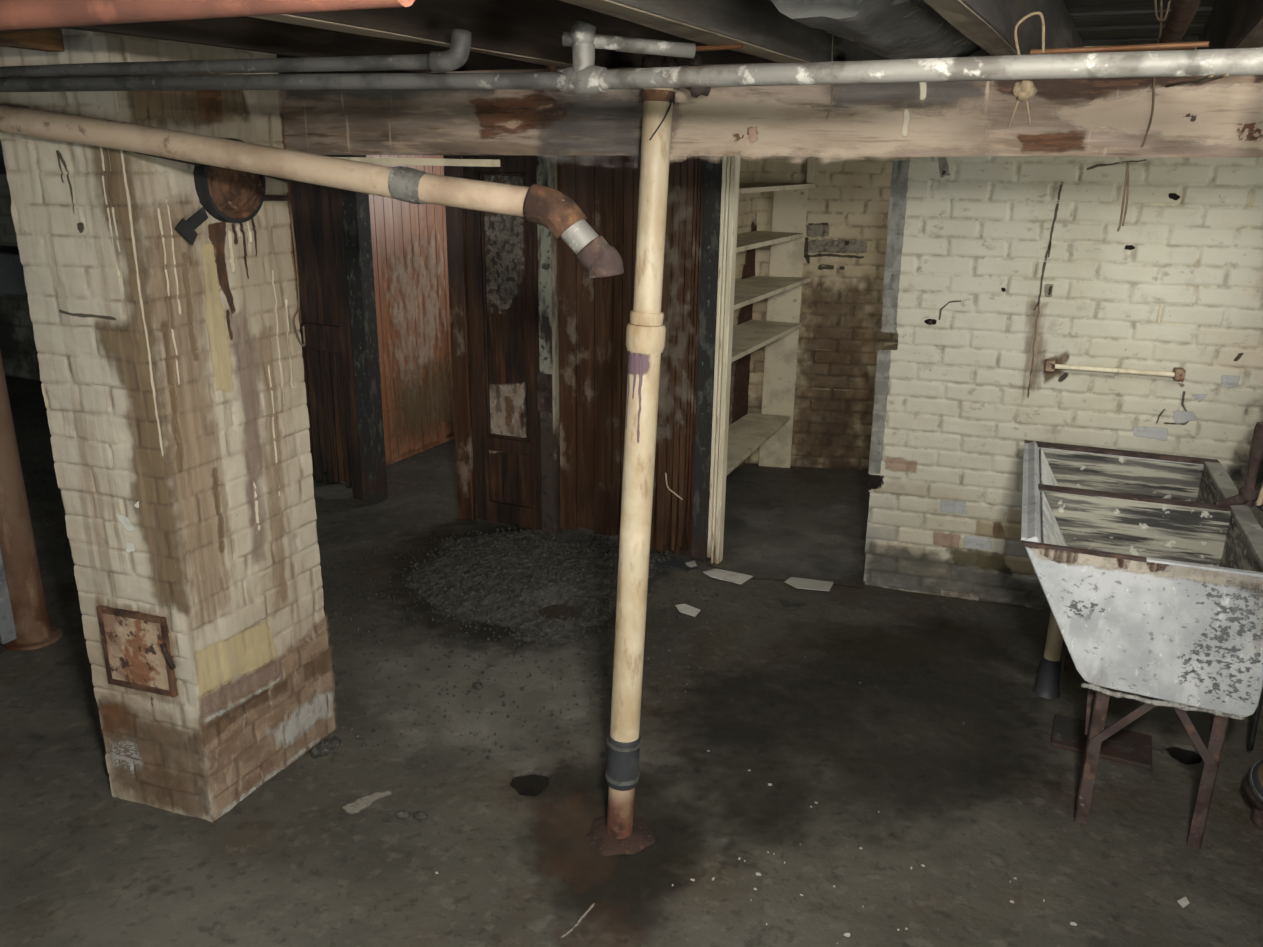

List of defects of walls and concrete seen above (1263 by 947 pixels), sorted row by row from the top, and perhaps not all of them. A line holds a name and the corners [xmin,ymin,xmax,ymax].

damp [115,90,249,125]
peeling [287,89,642,165]
peeling [670,81,993,333]
peeling [995,75,1263,152]
damp [90,145,301,622]
damp [798,279,871,469]
flaking render [200,618,336,818]